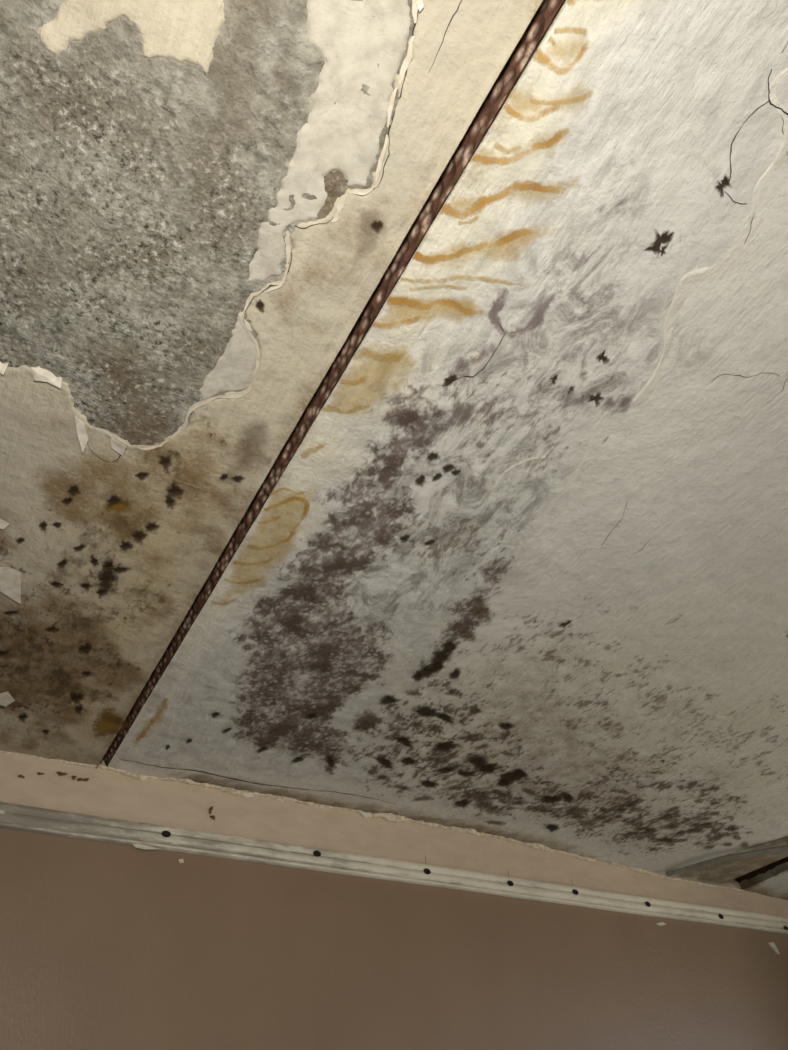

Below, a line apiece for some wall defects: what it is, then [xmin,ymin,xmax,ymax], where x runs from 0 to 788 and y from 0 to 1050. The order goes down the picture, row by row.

crack [373,0,462,190]
crack [724,42,788,244]
spalling [0,0,424,456]
water stain [645,231,673,254]
water stain [489,289,507,334]
water stain [521,300,550,333]
water stain [444,345,493,385]
water stain [160,452,179,471]
water stain [166,483,183,507]
water stain [0,496,159,722]
water stain [222,388,754,860]
water stain [94,709,124,736]